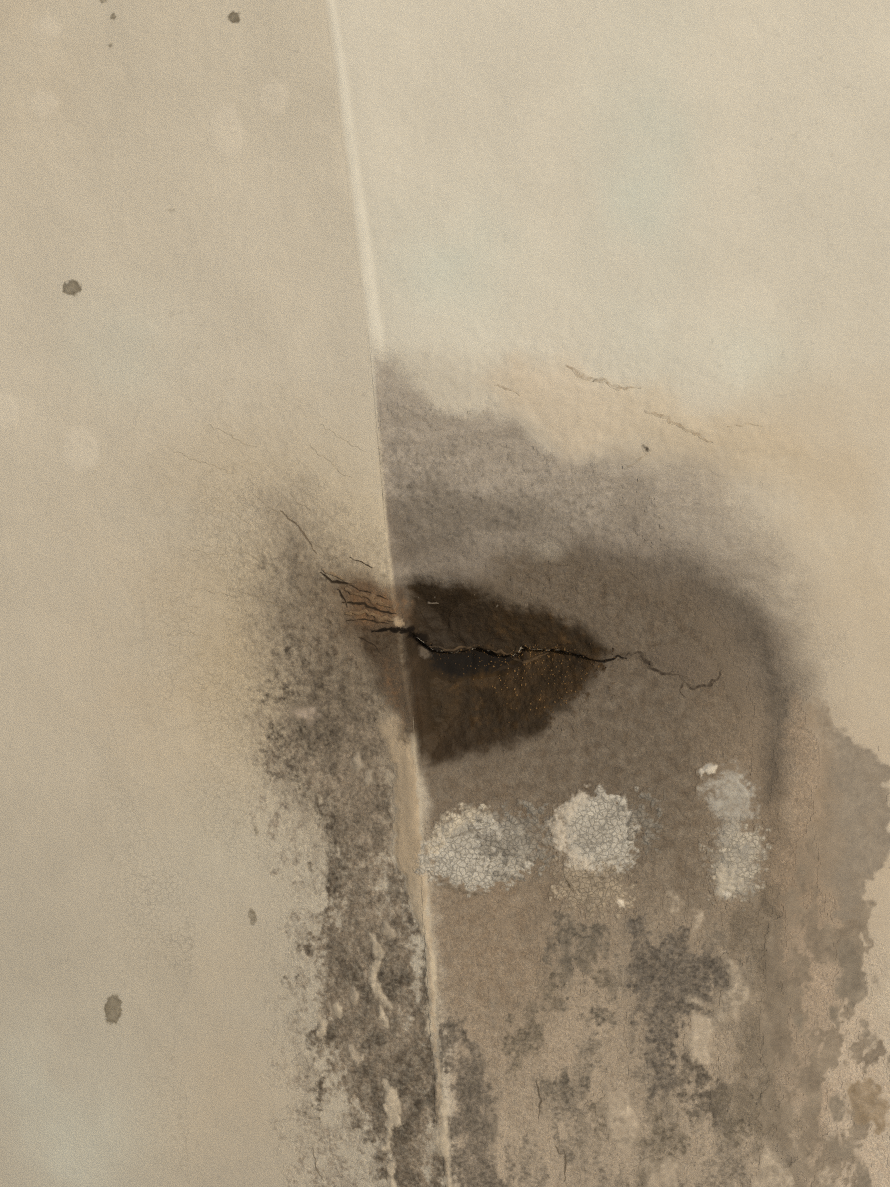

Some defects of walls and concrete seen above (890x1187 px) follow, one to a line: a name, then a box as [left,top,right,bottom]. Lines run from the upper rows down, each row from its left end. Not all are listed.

crack [216,493,722,698]
damp [90,323,856,1187]
damp [866,857,890,954]